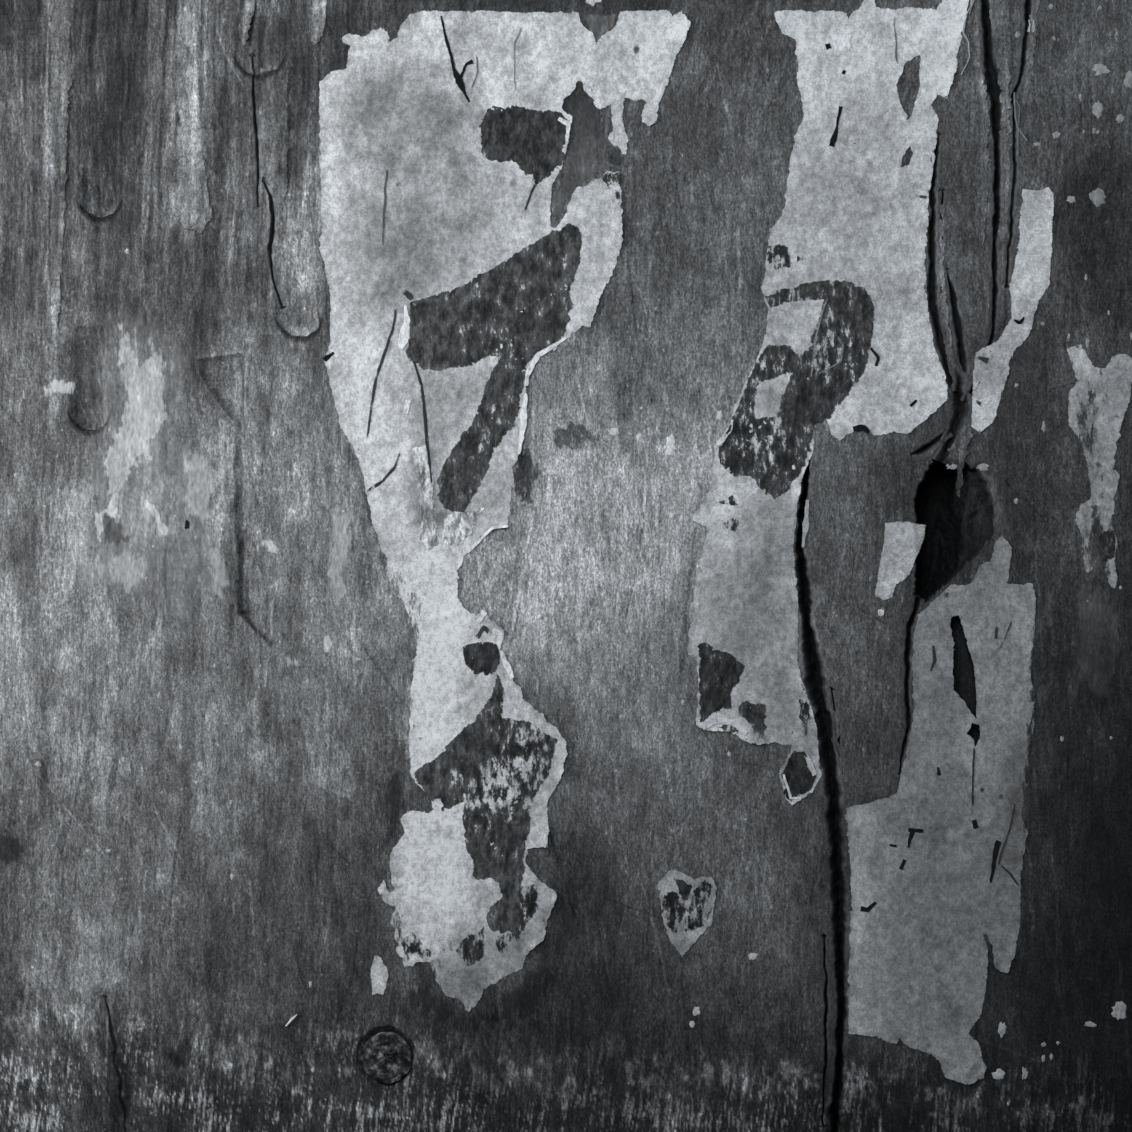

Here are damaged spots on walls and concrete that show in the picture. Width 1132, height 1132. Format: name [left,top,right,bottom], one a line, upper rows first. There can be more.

crack [911,0,1036,466]
crack [793,423,851,1132]